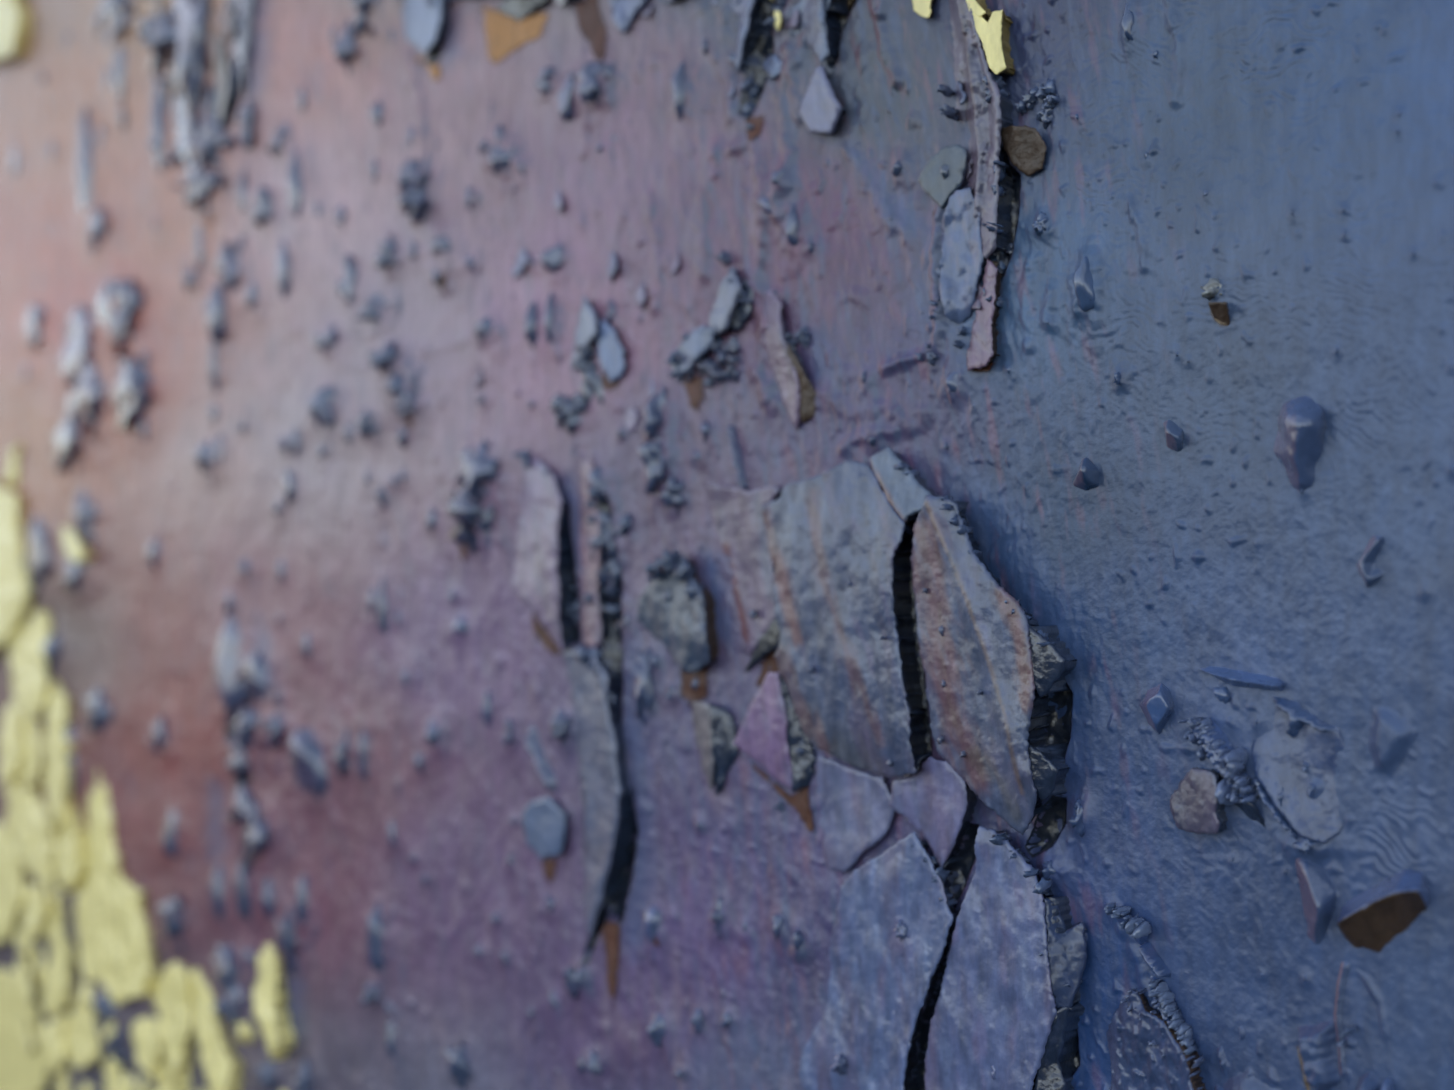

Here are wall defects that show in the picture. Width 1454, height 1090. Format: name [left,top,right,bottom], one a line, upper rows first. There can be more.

peeling [710,0,855,135]
peeling [914,0,1060,371]
crack [997,152,1021,282]
peeling [650,250,816,430]
peeling [0,444,298,1090]
crack [568,492,624,724]
crack [578,783,639,967]
corrosion [756,650,779,686]
corrosion [753,764,814,831]
peeling [691,446,1087,1090]
crack [907,520,932,771]
crack [911,823,979,1090]